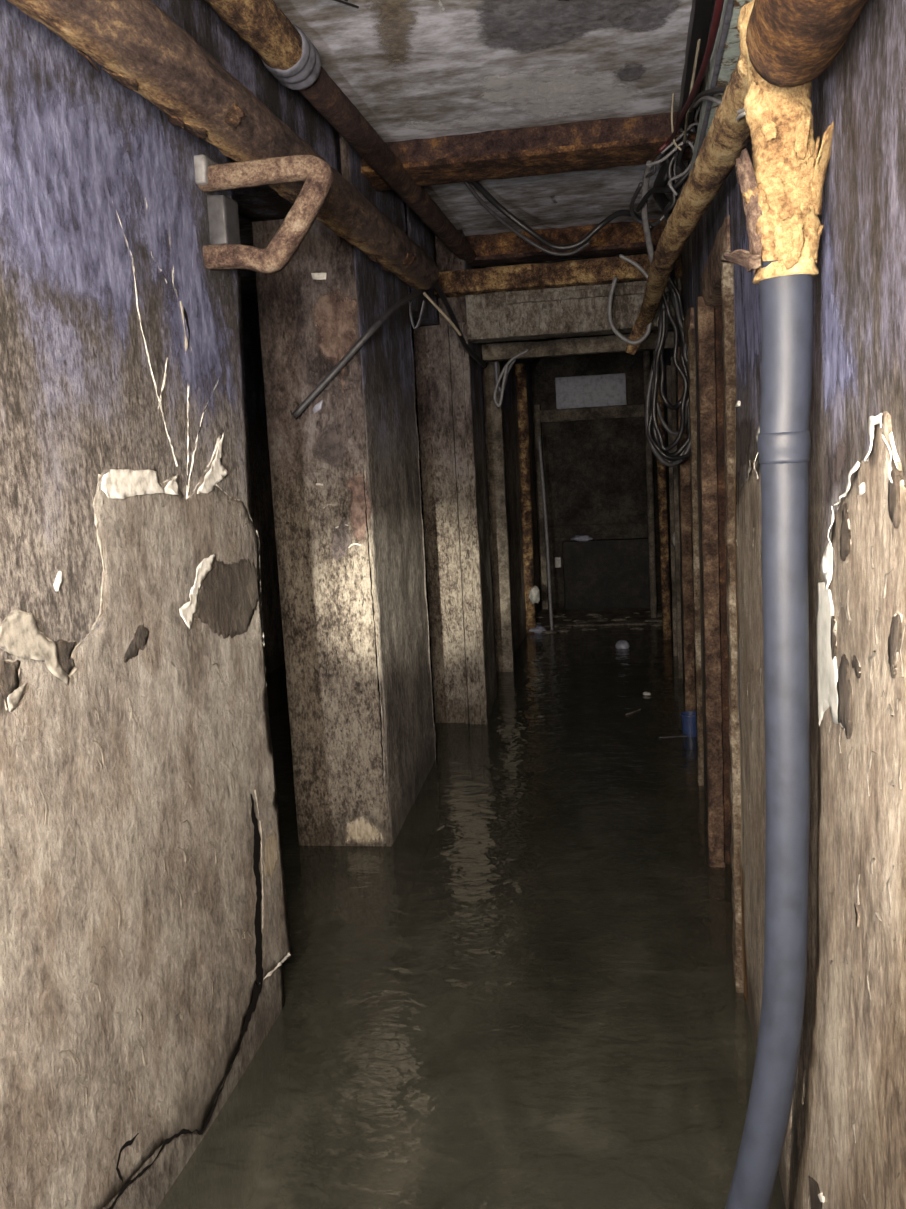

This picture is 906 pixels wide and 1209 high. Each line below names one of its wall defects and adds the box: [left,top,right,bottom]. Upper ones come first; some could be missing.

damp [476,0,678,53]
peeling [0,433,293,1209]
crack [107,790,290,1209]
spalling [298,468,348,568]
peeling [736,425,766,1054]
peeling [778,411,906,1209]